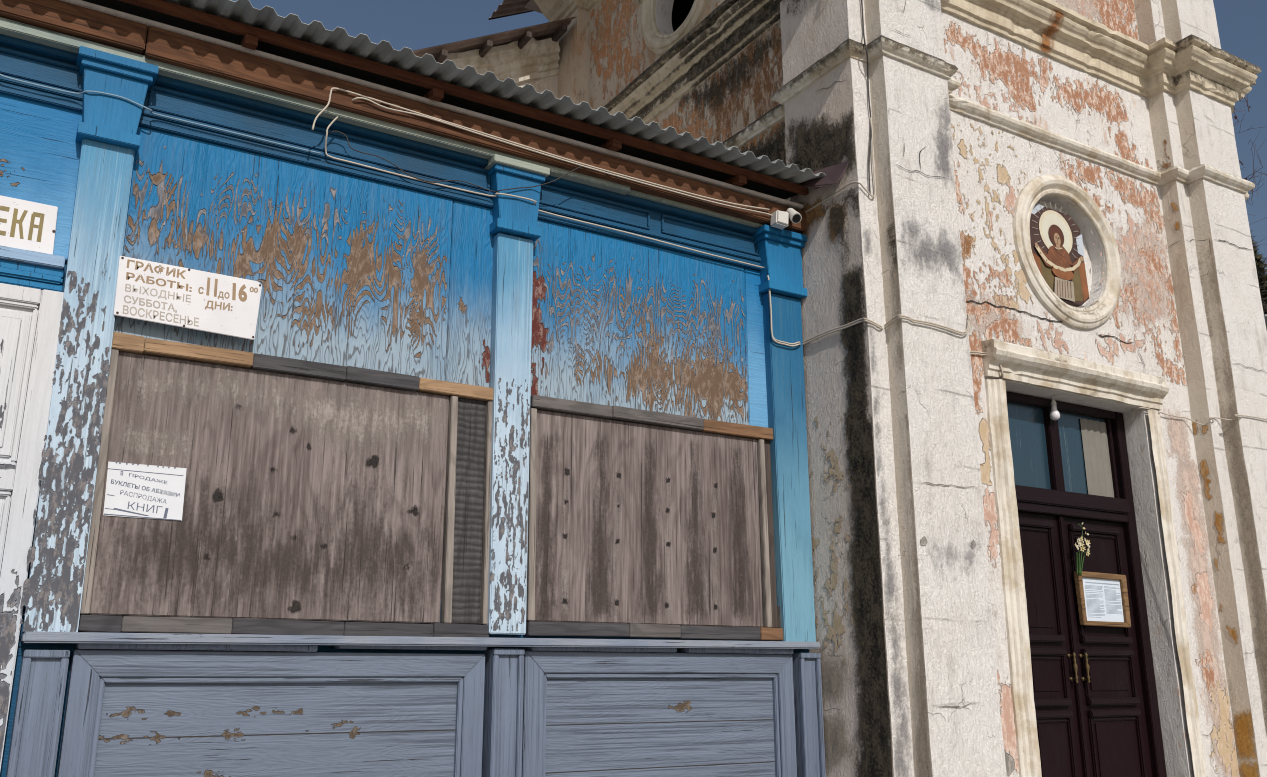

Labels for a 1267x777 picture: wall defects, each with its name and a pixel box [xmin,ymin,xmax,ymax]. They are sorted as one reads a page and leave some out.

peeling [0,270,110,759]
peeling [124,146,467,358]
peeling [478,239,748,631]
leakage [678,0,800,110]
leakage [733,452,750,615]
leakage [739,107,856,173]
leakage [801,191,929,777]
peeling [951,123,1069,568]
crack [966,300,1062,322]
peeling [944,18,1187,385]
peeling [1181,459,1238,645]
peeling [1195,649,1239,777]